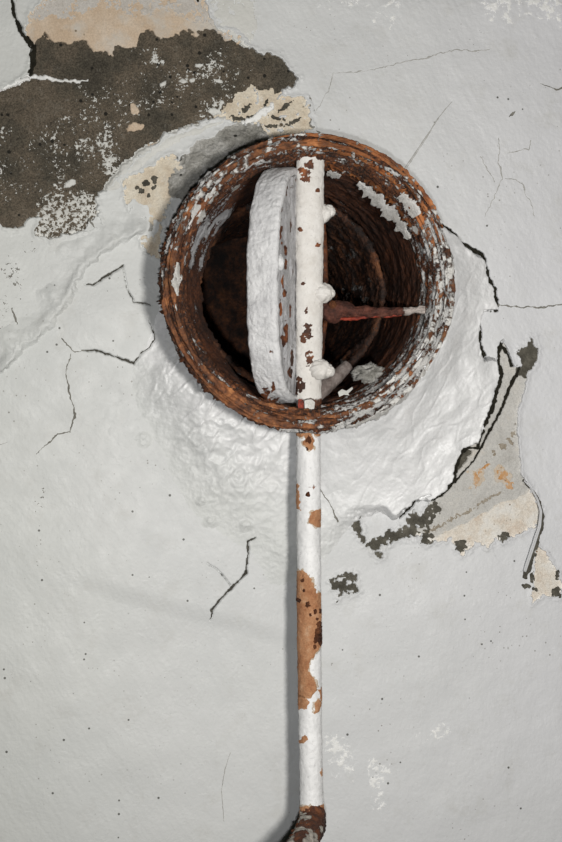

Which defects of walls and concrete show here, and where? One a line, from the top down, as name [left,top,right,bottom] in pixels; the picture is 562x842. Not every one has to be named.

crack [11,0,37,77]
flaking render [0,0,313,259]
crack [309,49,490,133]
crack [480,138,534,216]
crack [86,265,151,306]
corrosion [156,133,456,452]
crack [36,326,155,454]
corrosion [296,483,321,529]
flaking render [351,338,562,603]
crack [209,537,256,620]
flaking render [329,572,359,603]
corrosion [296,568,322,714]